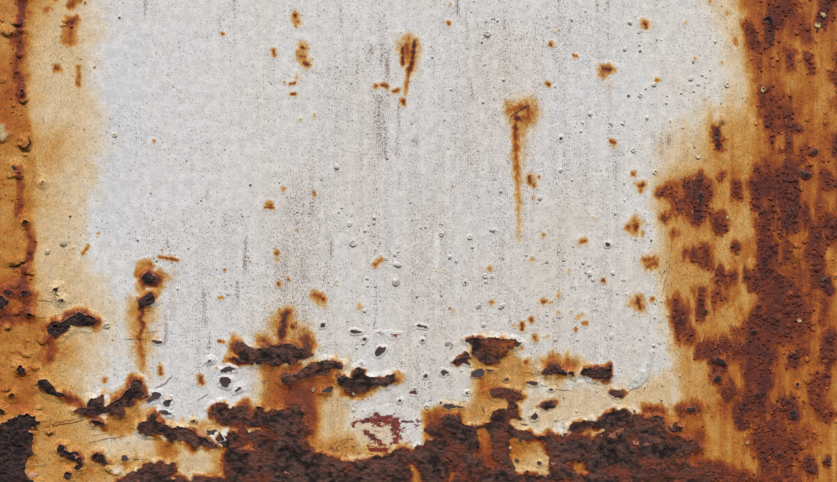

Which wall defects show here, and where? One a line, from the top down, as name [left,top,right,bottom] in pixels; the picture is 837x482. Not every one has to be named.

rust [267,6,319,99]
rust [370,26,430,110]
rust [0,0,214,482]
rust [415,0,837,482]
peeling [0,279,107,348]
rust [242,364,285,407]
rust [298,379,360,435]
peeling [0,321,732,482]